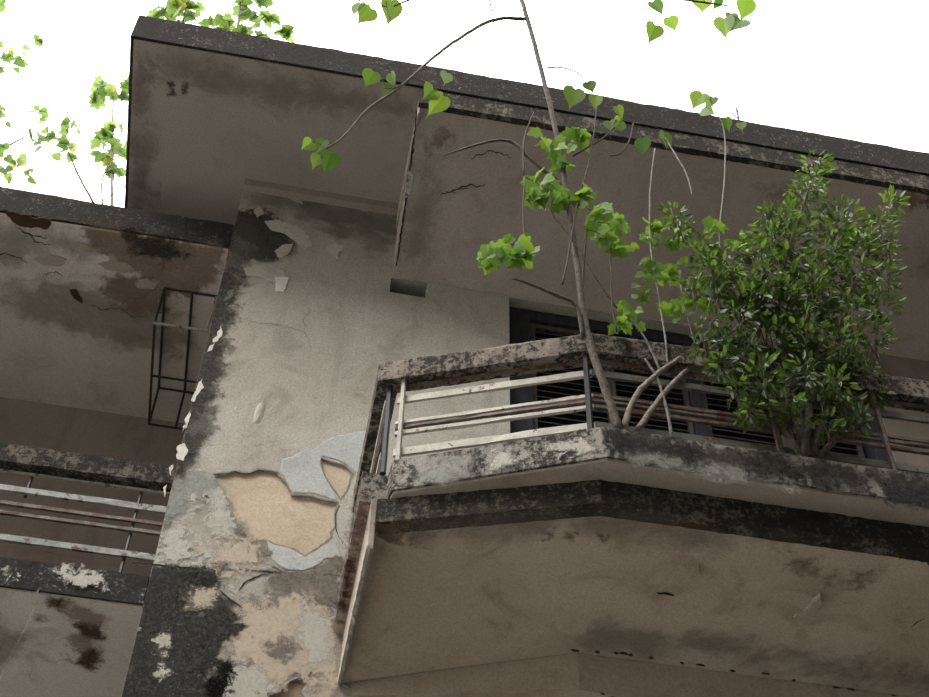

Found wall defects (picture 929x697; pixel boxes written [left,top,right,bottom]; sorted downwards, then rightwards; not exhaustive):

crack [441,184,485,195]
peeling [243,206,313,293]
peeling [169,412,191,475]
water stain [83,208,295,697]
peeling [212,431,366,571]
water stain [416,456,470,483]
water stain [490,449,519,469]
water stain [542,437,595,458]
water stain [601,426,929,510]
water stain [272,555,344,609]
peeling [223,591,348,697]